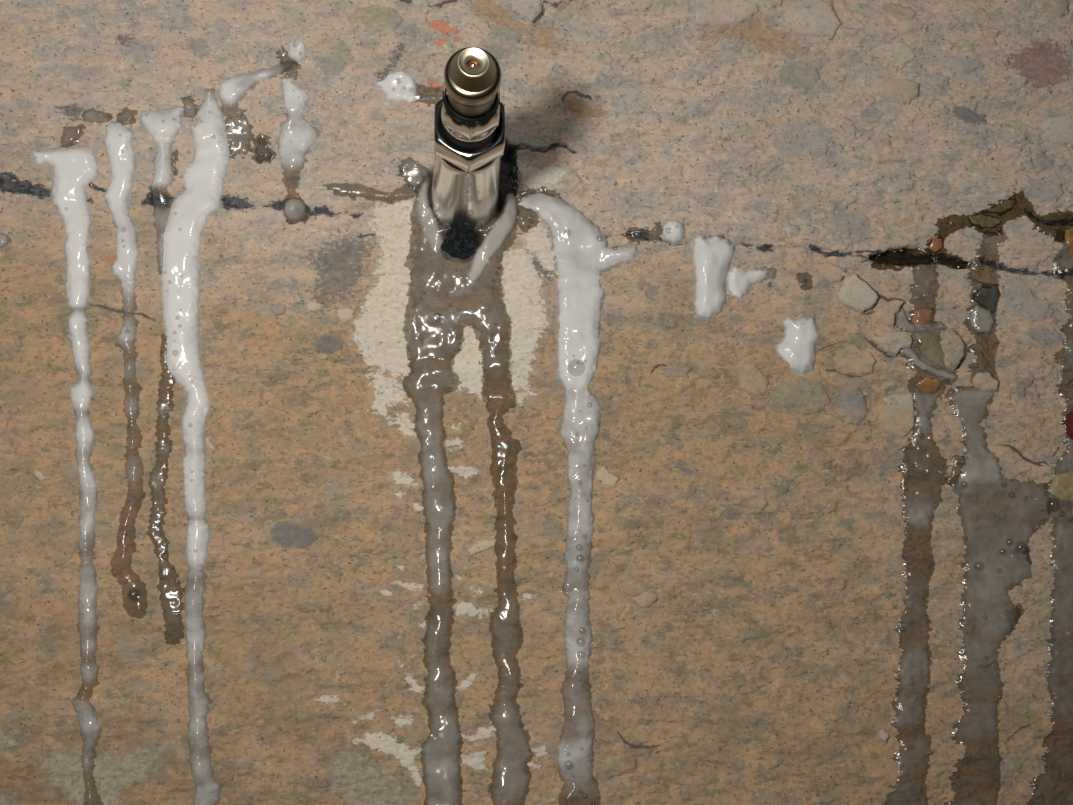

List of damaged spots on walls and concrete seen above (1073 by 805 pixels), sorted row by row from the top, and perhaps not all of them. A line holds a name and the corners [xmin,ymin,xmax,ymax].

crack [0,172,51,199]
crack [86,183,106,202]
crack [141,185,176,210]
crack [221,195,376,237]
water stain [348,196,420,438]
water stain [496,215,559,407]
crack [718,236,906,358]
crack [936,257,1073,280]
water stain [448,323,488,404]
water stain [34,742,170,805]
water stain [320,709,424,805]
water stain [457,722,497,771]